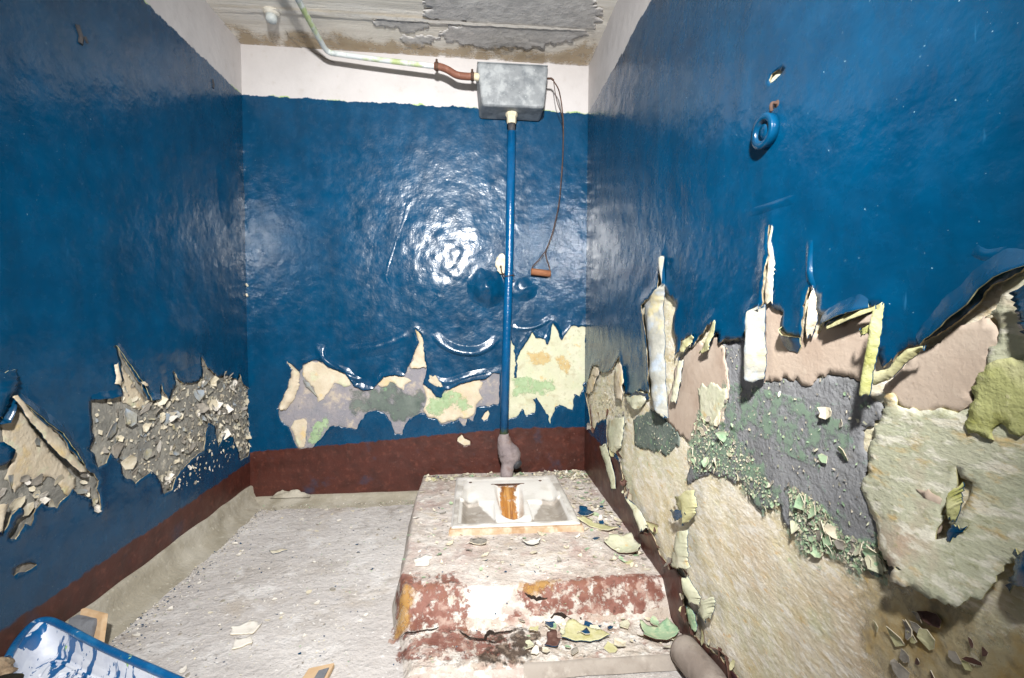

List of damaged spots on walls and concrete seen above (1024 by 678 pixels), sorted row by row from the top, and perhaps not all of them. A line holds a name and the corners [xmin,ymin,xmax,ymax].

spalling [372,0,603,51]
peeling [0,343,252,539]
peeling [278,226,1024,678]